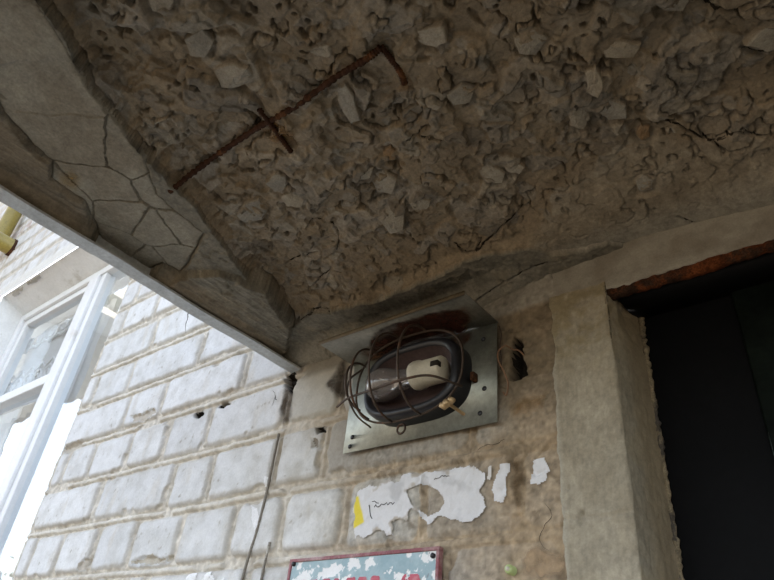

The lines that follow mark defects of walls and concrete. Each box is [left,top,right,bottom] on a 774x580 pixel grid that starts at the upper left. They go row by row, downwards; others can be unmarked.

spalling [0,0,774,319]
peeling [186,571,224,580]